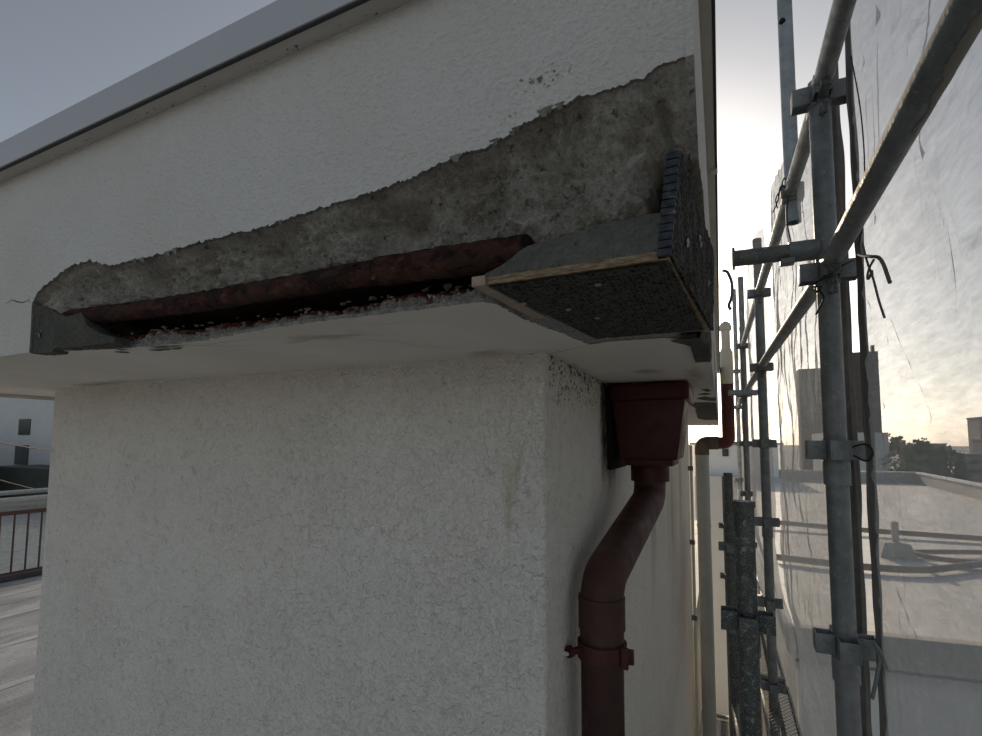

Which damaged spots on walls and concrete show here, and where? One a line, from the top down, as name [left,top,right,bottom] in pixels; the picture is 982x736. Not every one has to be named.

spalling [37,60,703,314]
rust [116,289,471,351]
spalling [57,273,709,353]